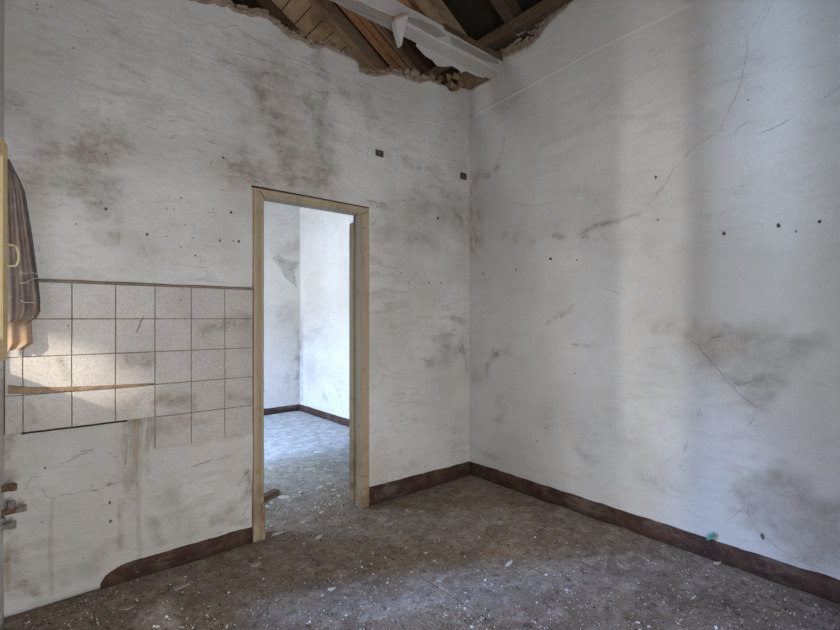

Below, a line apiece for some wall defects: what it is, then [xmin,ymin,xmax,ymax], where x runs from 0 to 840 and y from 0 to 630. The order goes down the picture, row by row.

flaking render [190,0,443,85]
flaking render [408,3,569,64]